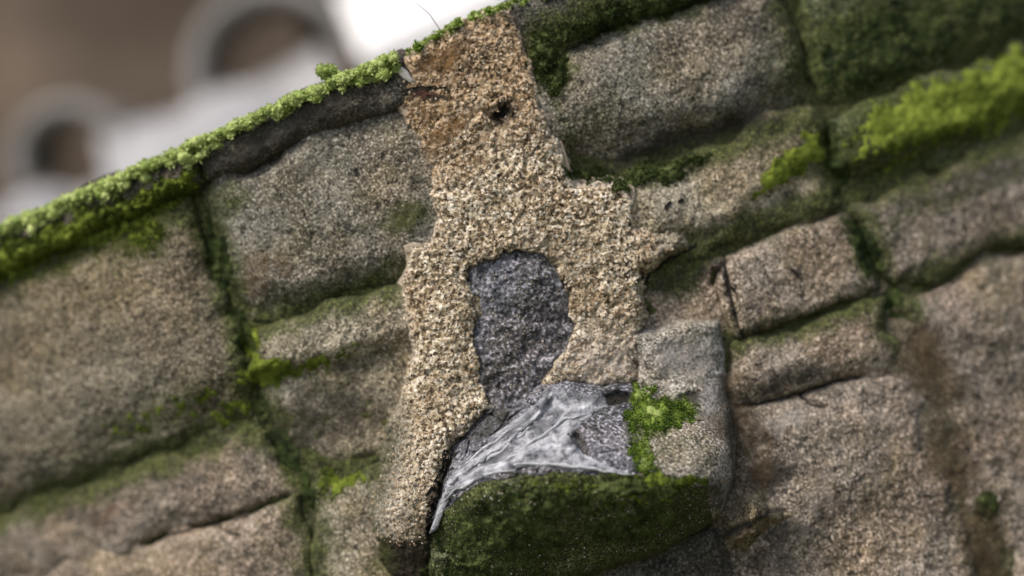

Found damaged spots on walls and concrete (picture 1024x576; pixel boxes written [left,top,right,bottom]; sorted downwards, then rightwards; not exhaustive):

spalling [366,9,689,576]